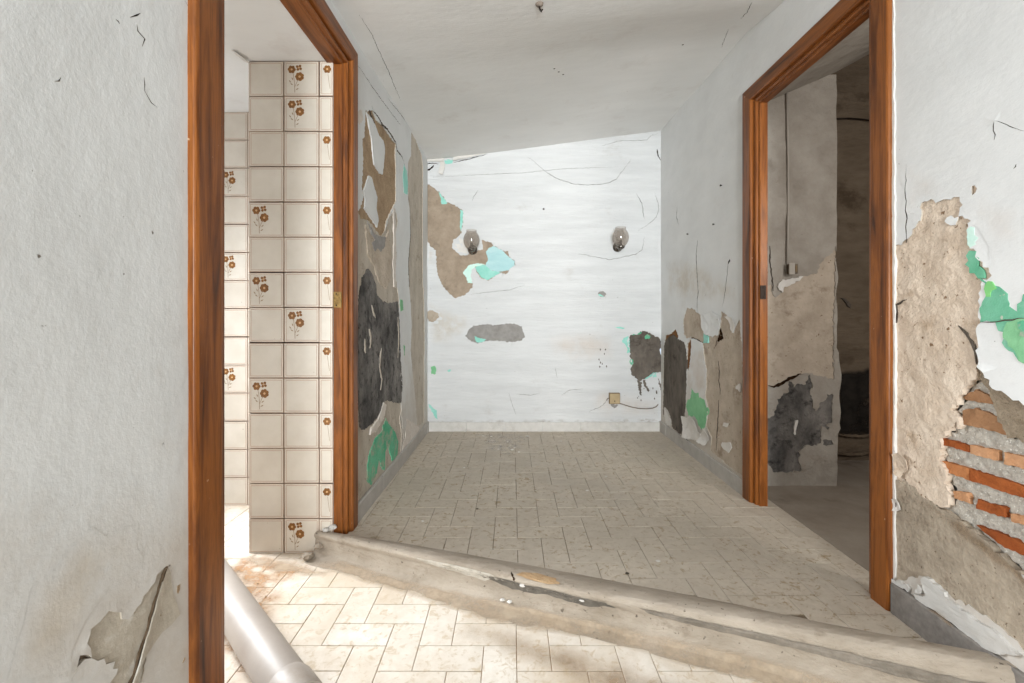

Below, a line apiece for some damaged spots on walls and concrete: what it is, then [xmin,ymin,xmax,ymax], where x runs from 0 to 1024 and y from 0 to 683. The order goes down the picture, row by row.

crack [358,15,661,196]
spalling [358,400,401,501]
spalling [358,110,515,425]
spalling [465,323,525,343]
spalling [615,327,661,400]
spalling [664,308,742,474]
spalling [768,250,852,386]
spalling [896,197,1024,570]
peeling [79,566,180,683]